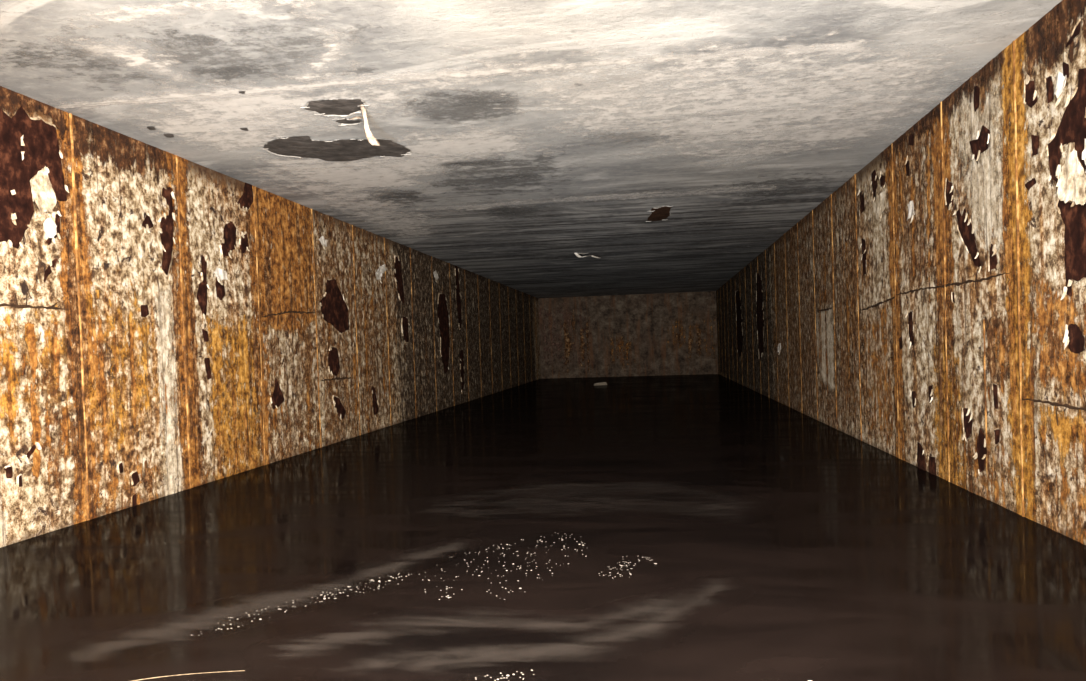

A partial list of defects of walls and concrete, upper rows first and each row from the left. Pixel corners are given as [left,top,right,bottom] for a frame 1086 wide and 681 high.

peeling [0,106,69,282]
crack [0,292,69,310]
peeling [142,183,176,277]
peeling [196,221,249,342]
corrosion [0,86,537,526]
water stain [12,29,1004,254]
corrosion [716,0,1086,544]
crack [861,269,1009,316]
peeling [944,178,999,273]
peeling [969,125,990,164]
peeling [1024,62,1086,300]
crack [1022,395,1086,426]